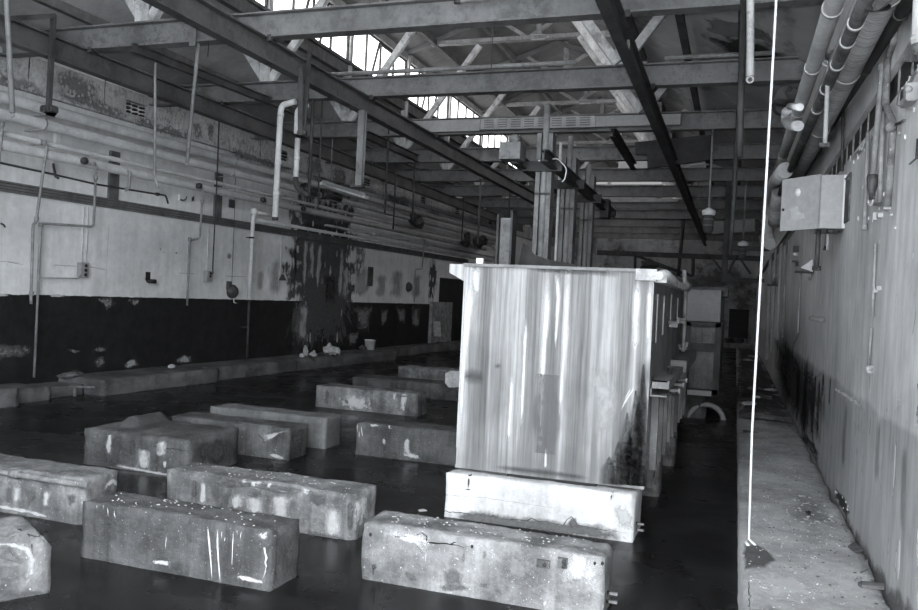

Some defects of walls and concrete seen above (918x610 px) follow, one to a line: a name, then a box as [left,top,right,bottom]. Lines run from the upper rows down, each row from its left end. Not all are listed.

leakage [737,343,871,448]